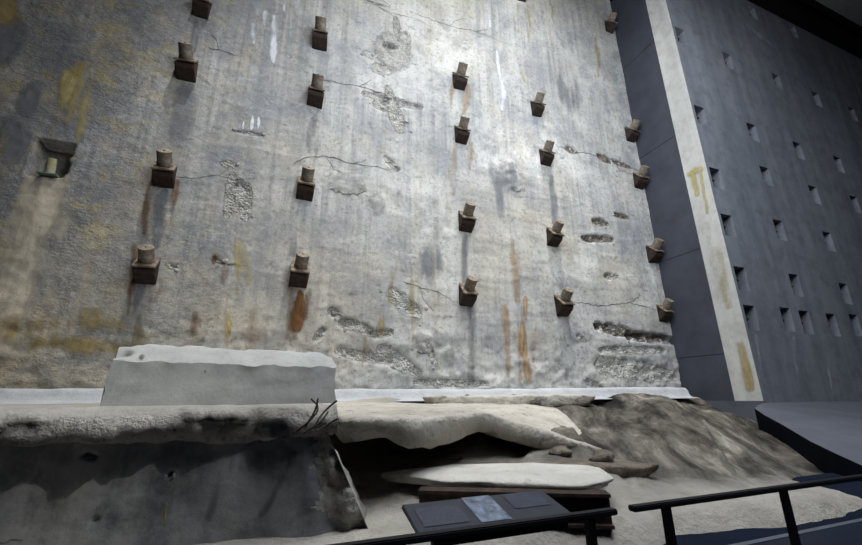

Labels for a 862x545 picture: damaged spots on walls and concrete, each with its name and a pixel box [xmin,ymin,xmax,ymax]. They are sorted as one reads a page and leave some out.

spalling [360,14,423,134]
spalling [220,159,254,221]
crack [294,155,396,173]
spalling [384,155,400,172]
spalling [581,210,629,245]
corrosion [290,290,308,332]
spalling [379,288,428,326]
spalling [328,308,489,387]
corrosion [513,256,531,382]
spalling [583,320,676,388]